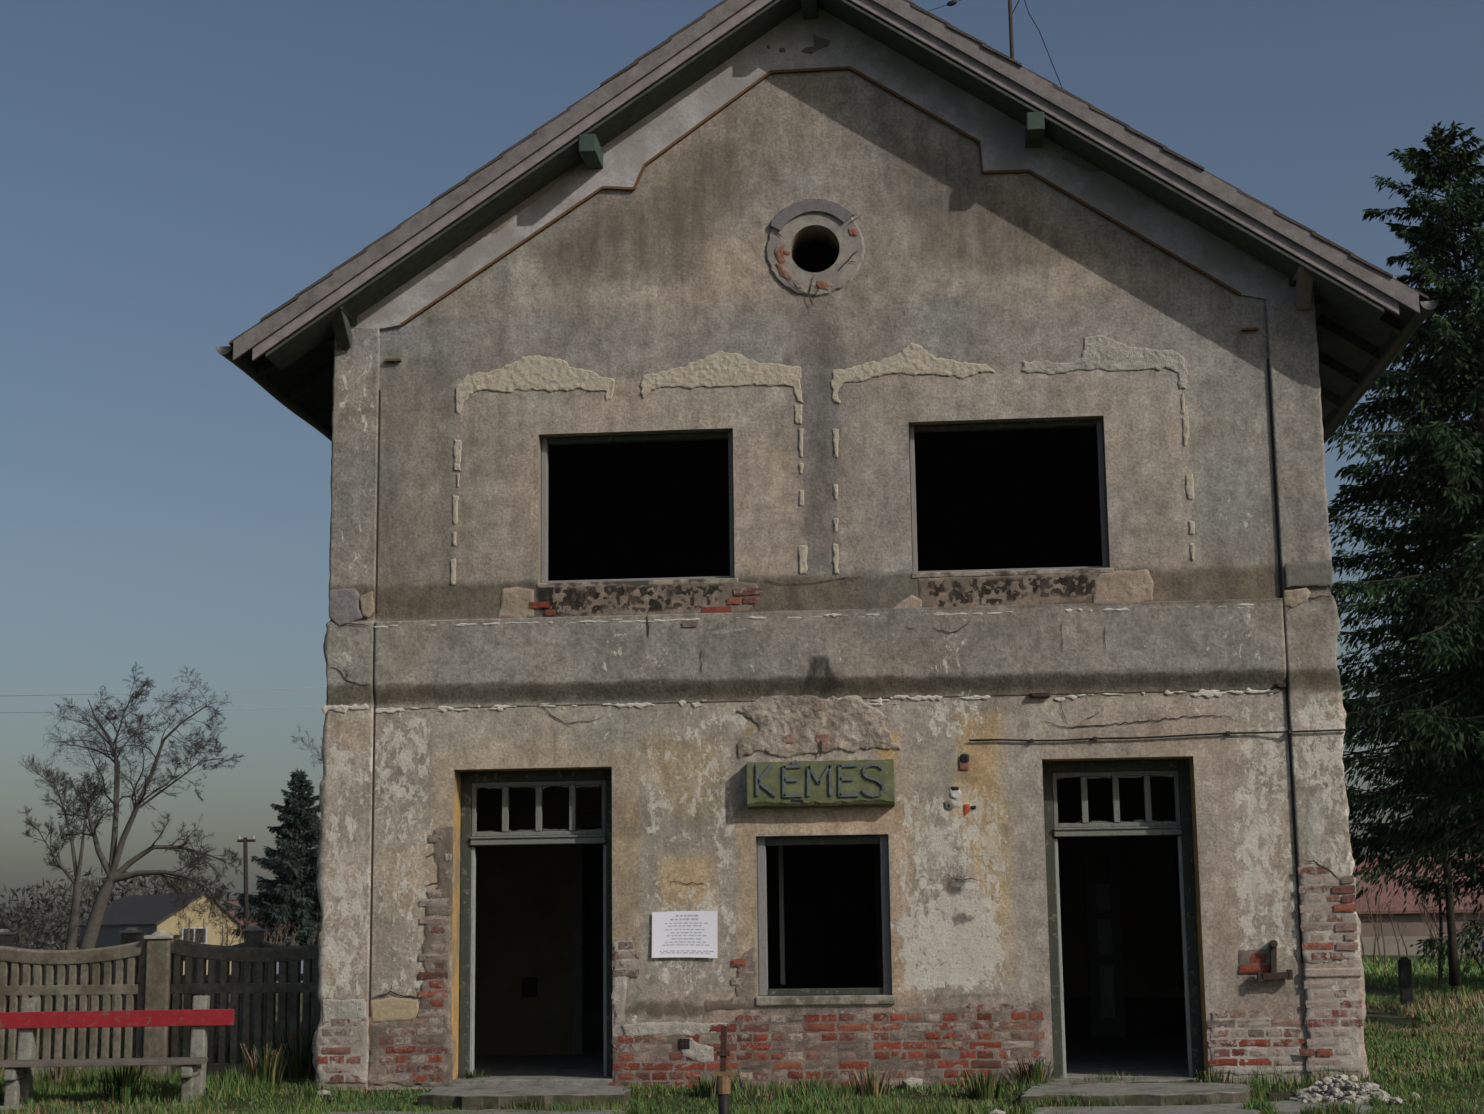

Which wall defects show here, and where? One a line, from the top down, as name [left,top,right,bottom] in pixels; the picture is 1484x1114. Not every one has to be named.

spalling [455,355,615,414]
spalling [831,343,995,404]
peeling [455,582,767,627]
peeling [787,569,1154,619]
peeling [321,703,516,714]
peeling [736,695,943,759]
crack [1039,696,1236,728]
peeling [1164,687,1280,698]
spalling [944,753,976,816]
flaking render [316,826,454,1087]
flaking render [1207,793,1363,1075]
flaking render [610,937,1045,1088]